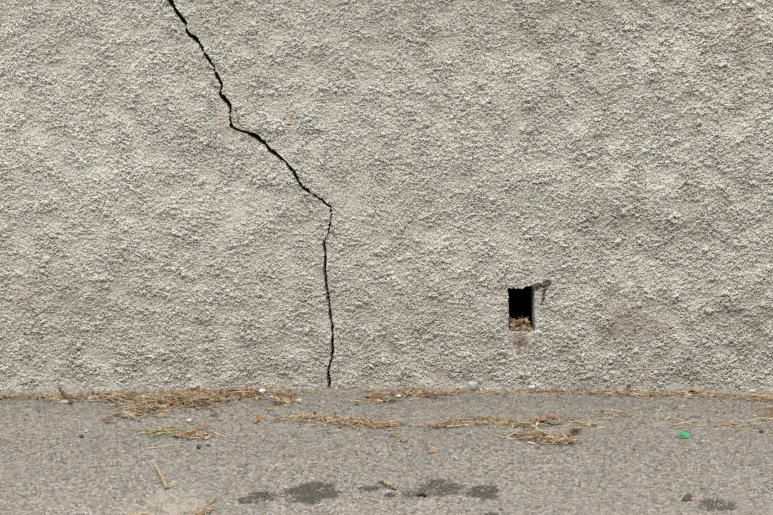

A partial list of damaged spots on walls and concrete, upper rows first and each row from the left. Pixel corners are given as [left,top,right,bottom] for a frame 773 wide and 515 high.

crack [167,0,341,387]